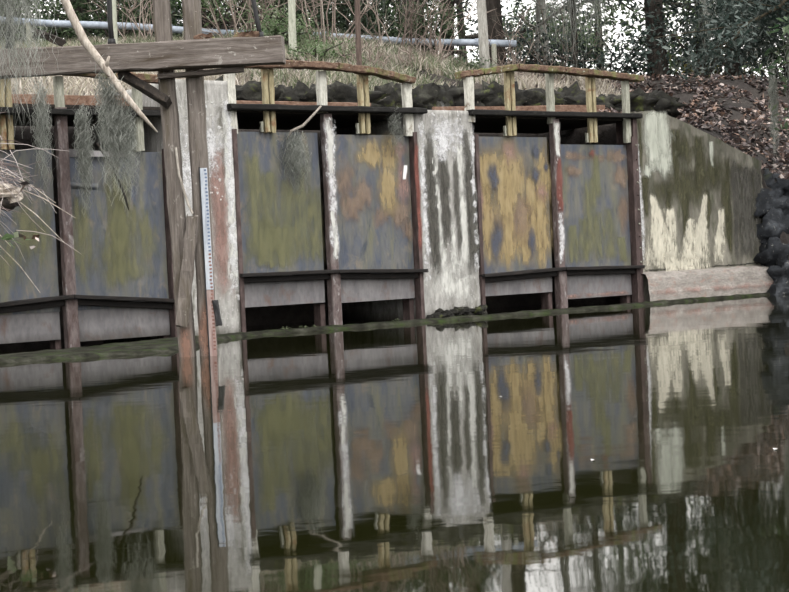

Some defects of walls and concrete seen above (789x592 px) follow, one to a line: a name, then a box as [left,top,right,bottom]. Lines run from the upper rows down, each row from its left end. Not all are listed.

water stain [645,112,671,177]
water stain [424,132,480,299]
corrosion [480,147,580,265]
water stain [646,161,762,271]